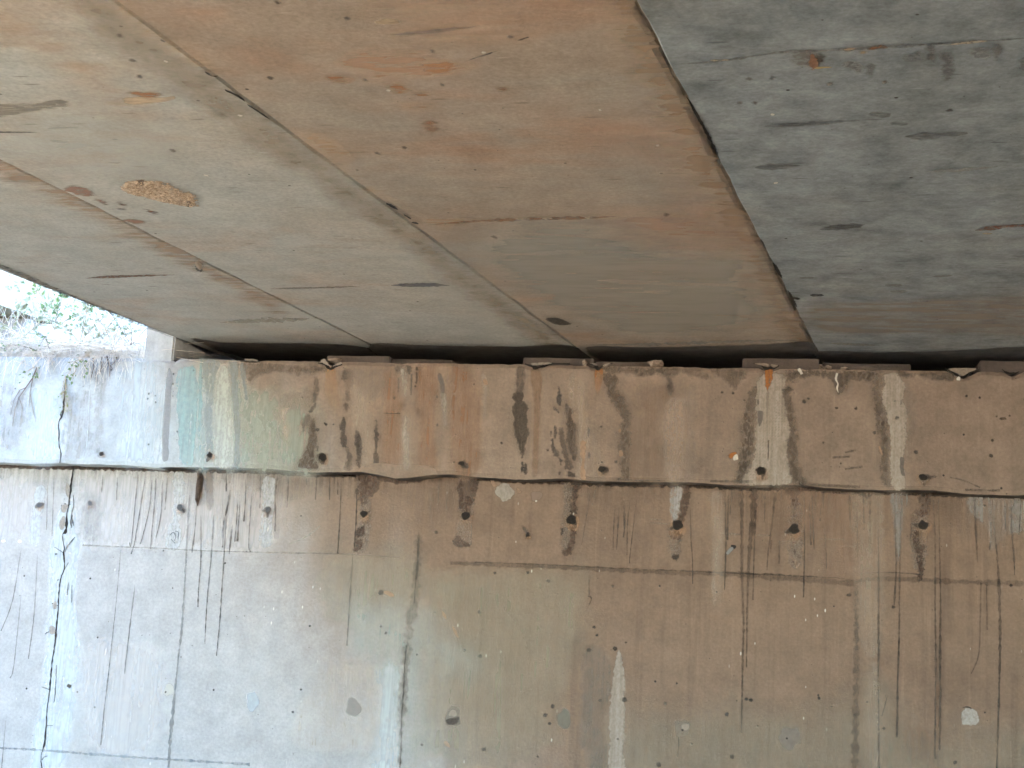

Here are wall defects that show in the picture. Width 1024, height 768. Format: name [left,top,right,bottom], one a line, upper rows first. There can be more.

spalling [119,180,198,224]
crack [41,385,74,768]
damp [194,290,1024,768]